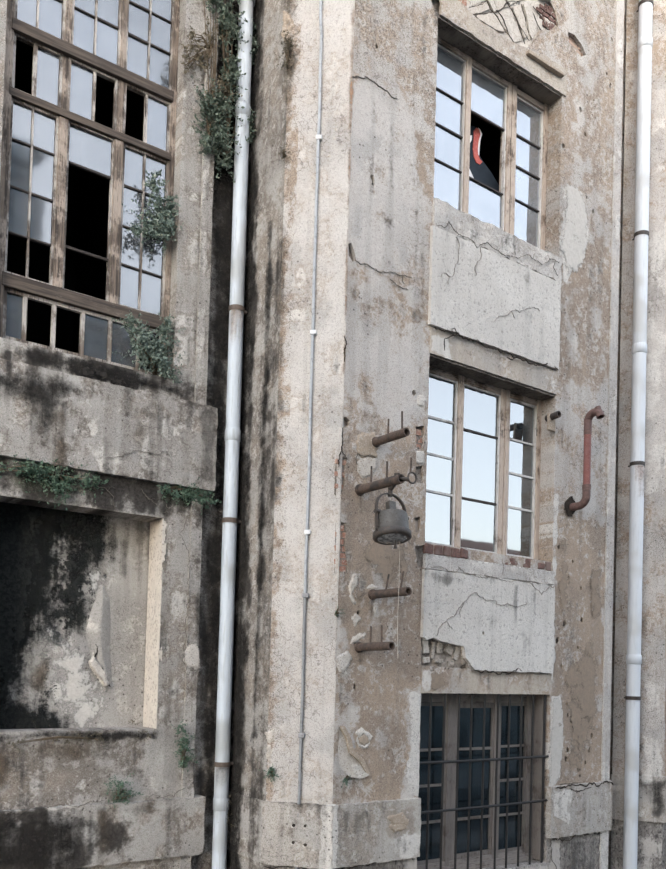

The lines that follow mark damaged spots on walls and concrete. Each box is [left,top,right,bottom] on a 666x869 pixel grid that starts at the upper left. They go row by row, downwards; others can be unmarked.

flaking render [459,0,557,48]
crack [351,76,397,99]
crack [437,221,560,284]
peeling [560,184,588,275]
water stain [0,349,180,434]
water stain [13,440,90,493]
crack [431,559,556,635]
water stain [0,502,157,757]
flaking render [421,638,466,669]
flaking render [338,726,371,779]
crack [556,781,613,792]
water stain [0,813,76,869]